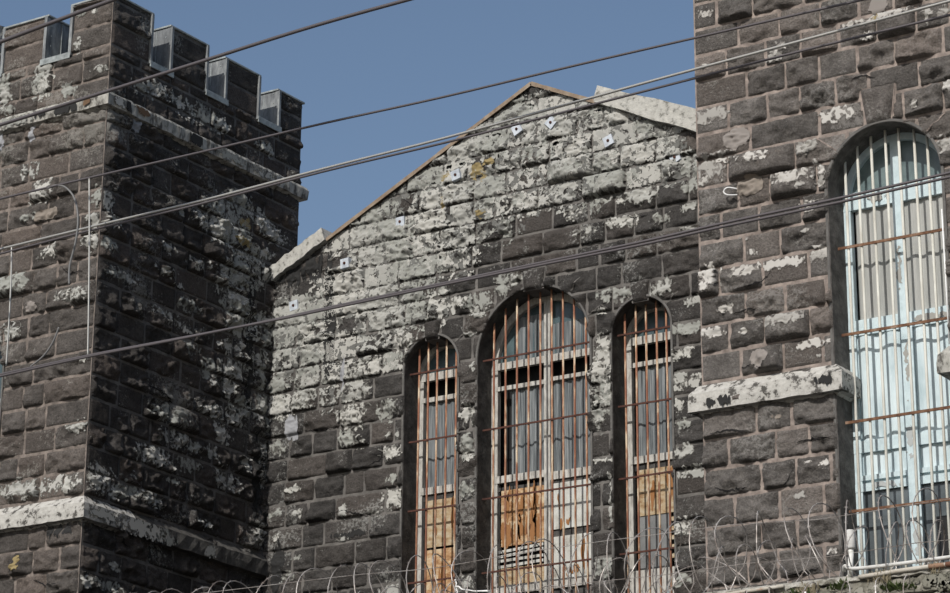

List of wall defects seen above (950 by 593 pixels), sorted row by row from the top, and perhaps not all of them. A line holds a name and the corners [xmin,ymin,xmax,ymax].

spalling [33,206,58,222]
spalling [25,301,37,313]